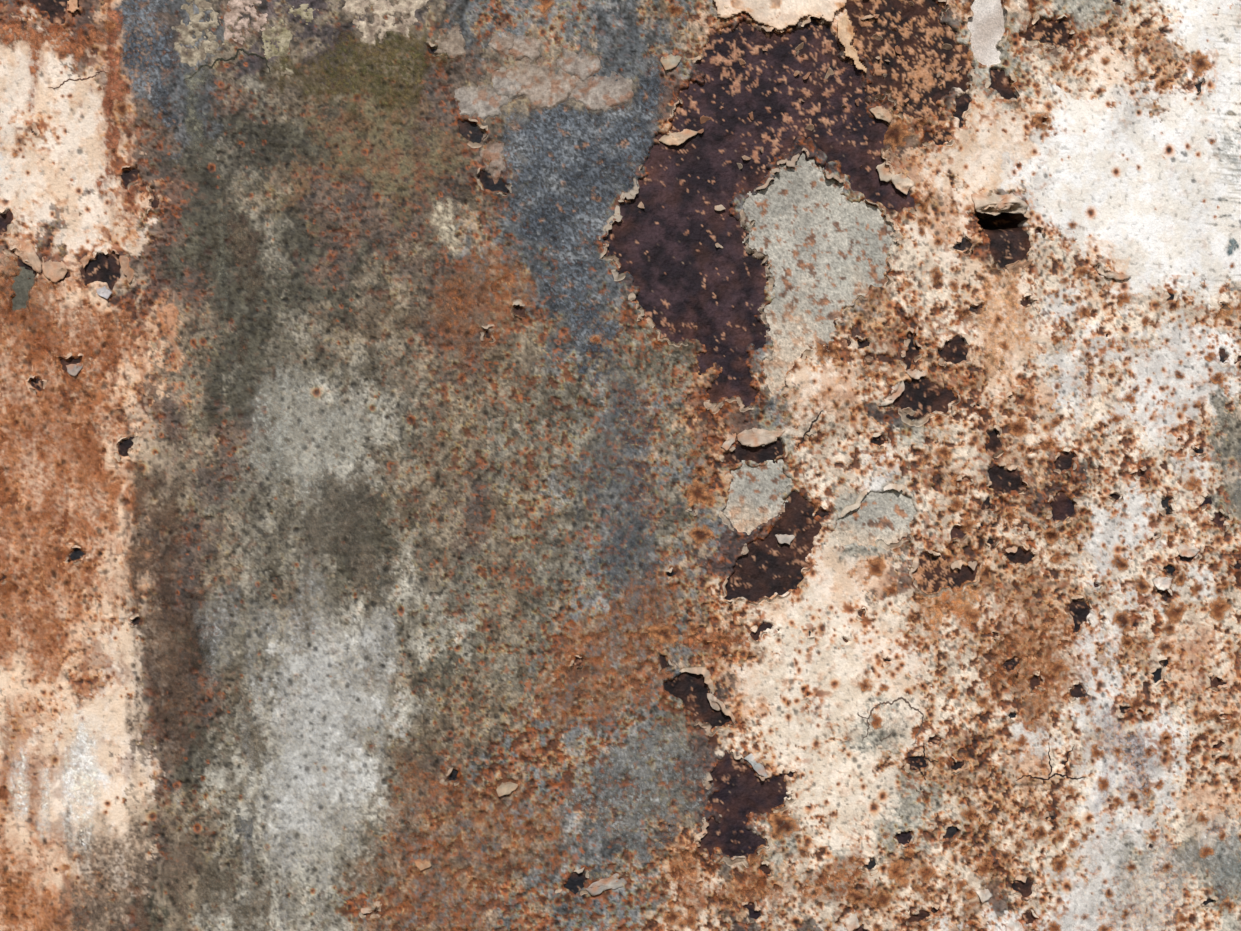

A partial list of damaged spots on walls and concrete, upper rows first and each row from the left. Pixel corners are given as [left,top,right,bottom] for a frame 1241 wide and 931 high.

peeling [1003,0,1080,52]
water stain [430,198,462,256]
peeling [599,0,1020,427]
peeling [971,190,1047,237]
water stain [250,369,359,494]
corrosion [1008,393,1059,467]
peeling [722,483,905,607]
corrosion [1111,555,1128,570]
corrosion [1176,571,1231,621]
corrosion [1112,602,1187,655]
peeling [693,749,797,880]
corrosion [1034,826,1087,873]